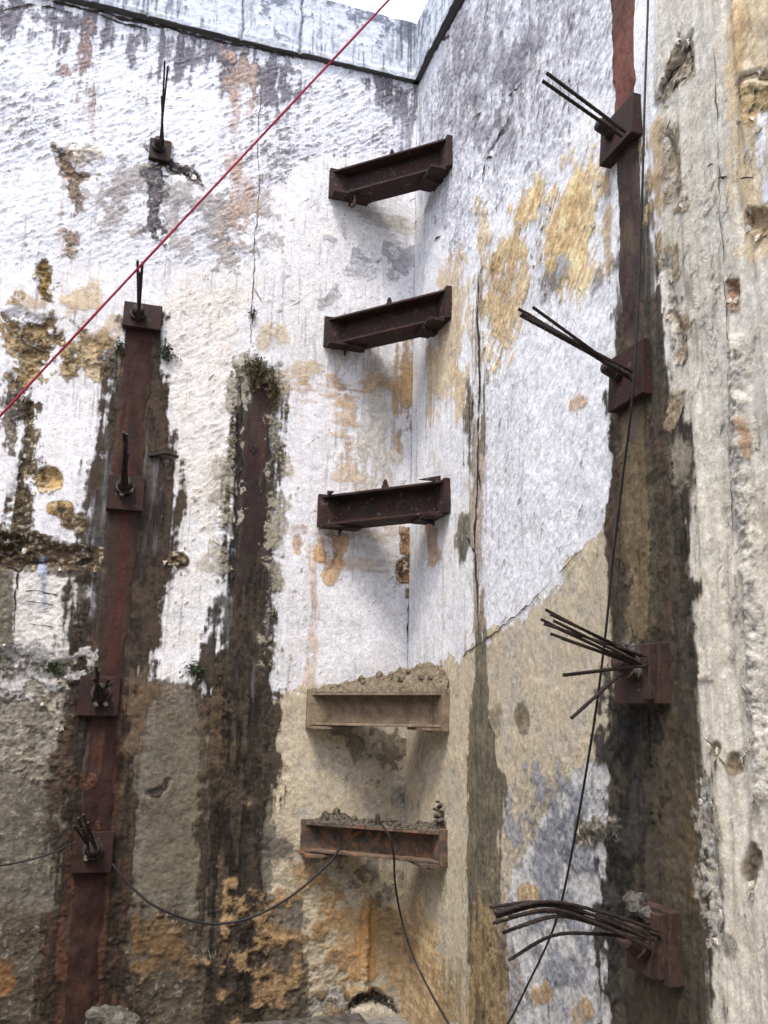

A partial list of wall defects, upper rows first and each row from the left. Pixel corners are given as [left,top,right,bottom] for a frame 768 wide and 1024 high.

peeling [654,29,695,111]
water stain [72,151,284,275]
peeling [474,121,608,381]
spalling [0,258,124,577]
water stain [187,355,299,1024]
water stain [454,512,470,564]
crack [462,275,584,657]
water stain [462,140,728,1024]
rust [604,416,623,652]
rust [41,860,76,1024]
rust [133,915,210,981]
spalling [339,988,400,1014]